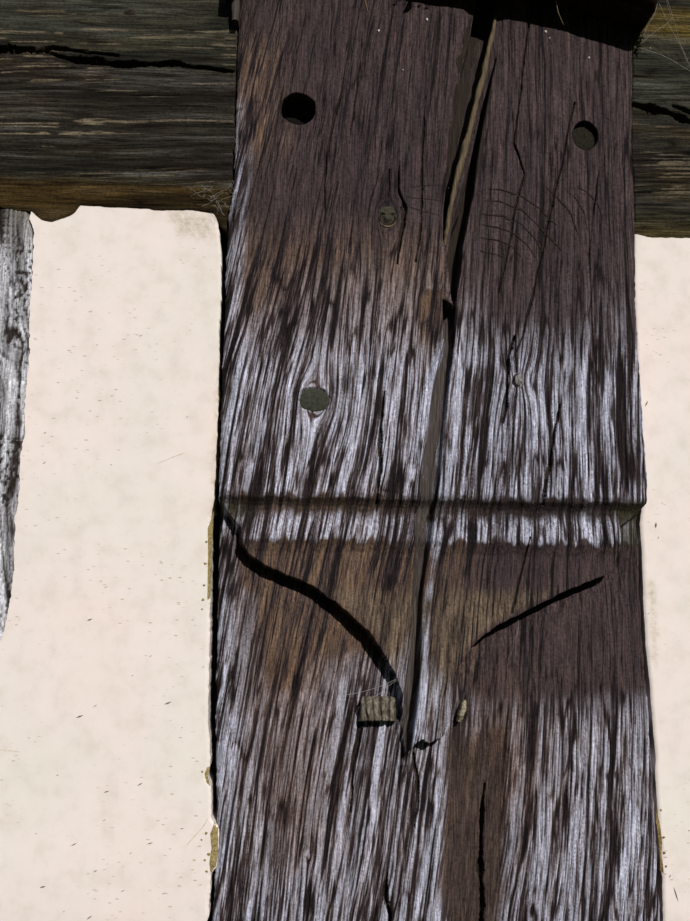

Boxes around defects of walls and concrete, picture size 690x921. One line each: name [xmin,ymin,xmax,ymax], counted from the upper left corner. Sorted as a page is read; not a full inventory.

crack [379,4,604,825]